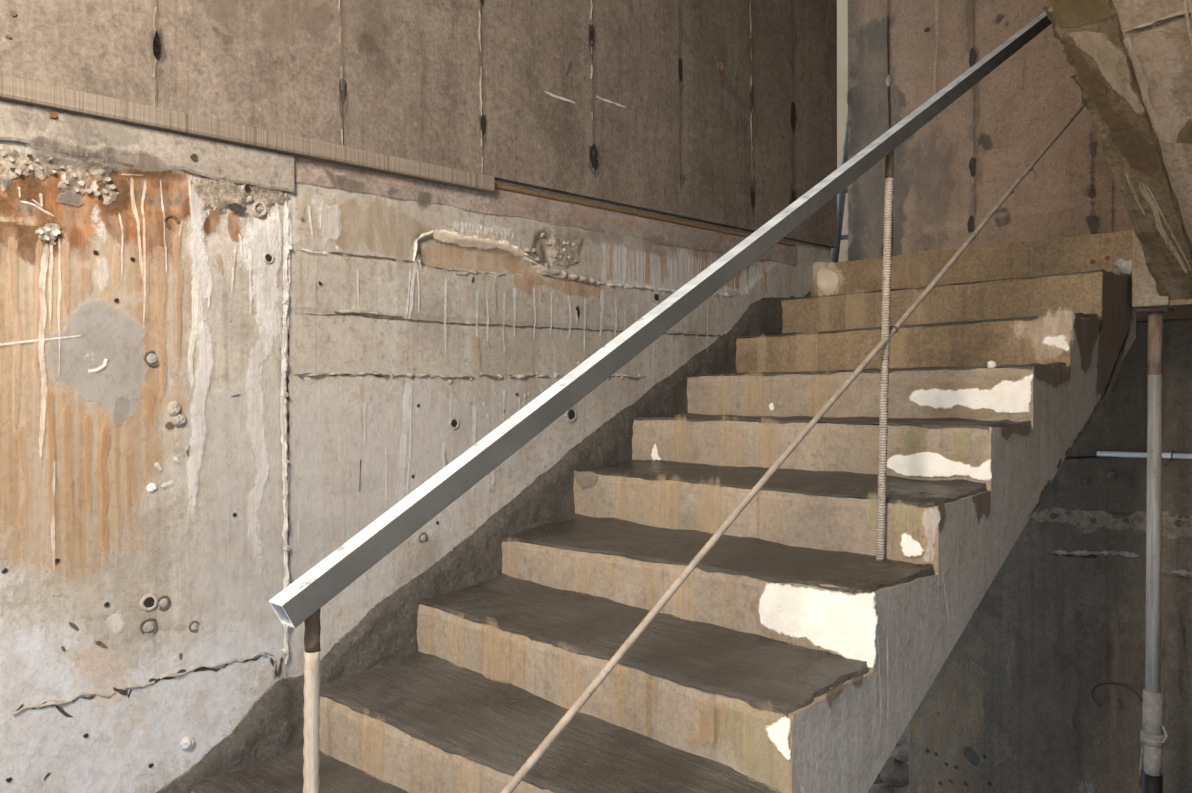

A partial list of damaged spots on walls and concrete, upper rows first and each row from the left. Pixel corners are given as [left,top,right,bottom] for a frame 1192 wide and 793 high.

spalling [0,144,119,244]
water stain [30,135,181,173]
water stain [188,186,212,385]
spalling [192,178,290,218]
water stain [232,206,282,336]
spalling [524,227,582,268]
corrosion [0,159,242,589]
crack [280,193,292,590]
spalling [1028,318,1147,533]
spalling [1161,511,1192,539]
crack [13,624,290,717]